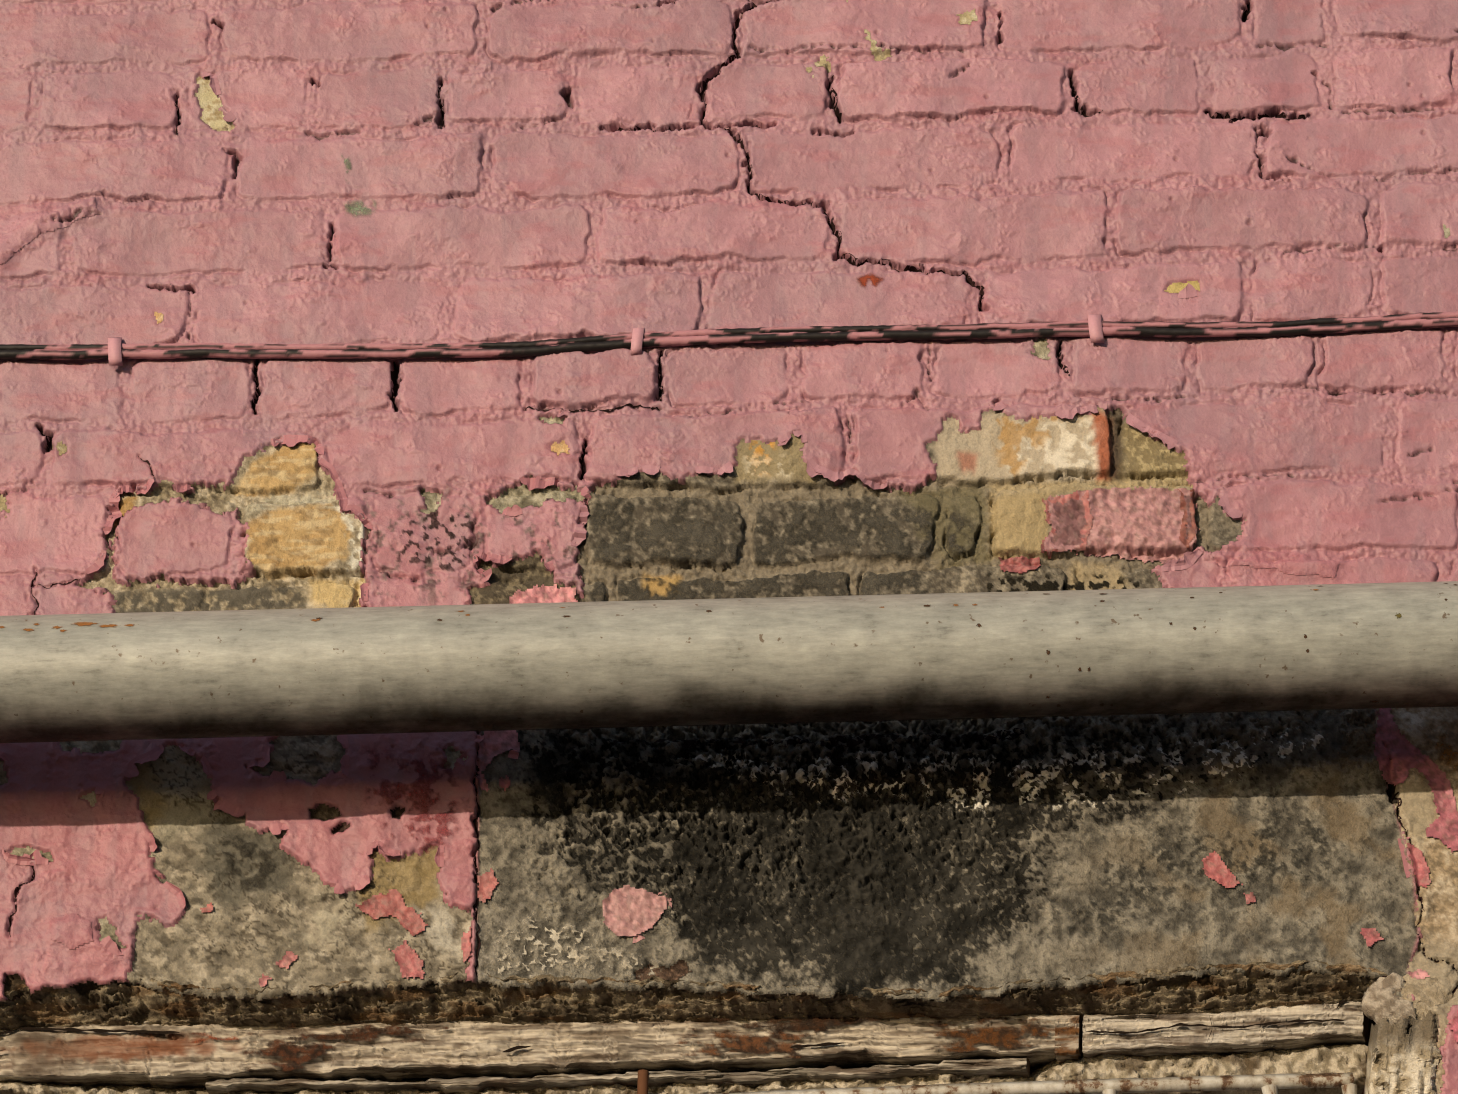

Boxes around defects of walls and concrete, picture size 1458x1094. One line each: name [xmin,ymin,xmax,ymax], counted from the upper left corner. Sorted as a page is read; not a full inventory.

crack [617,0,985,312]
peeling [76,435,373,613]
peeling [420,488,442,516]
peeling [470,401,1247,605]
peeling [0,707,1458,1094]
water stain [496,718,1328,998]
crack [1390,759,1412,845]
corrosion [192,1022,454,1071]
corrosion [675,1017,890,1058]
corrosion [928,1016,1064,1052]